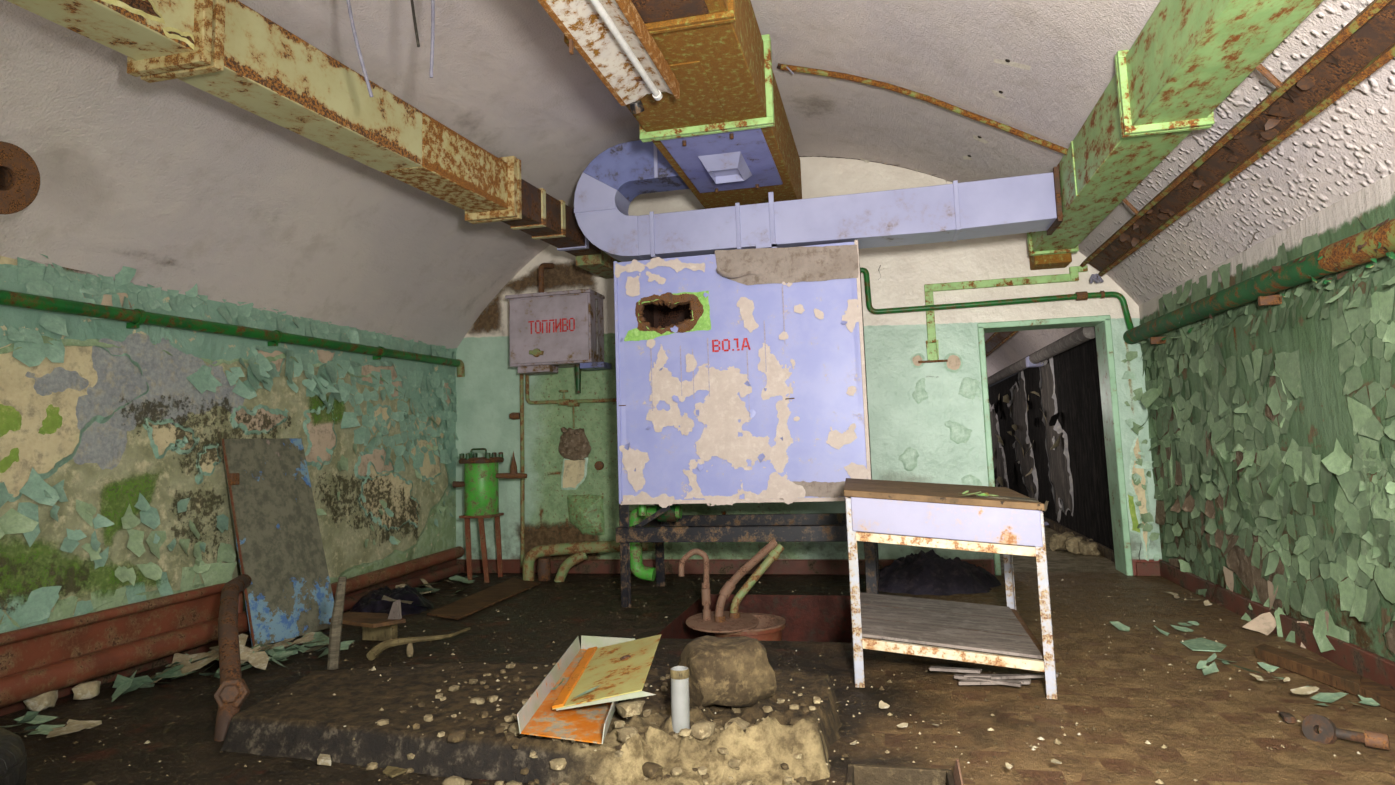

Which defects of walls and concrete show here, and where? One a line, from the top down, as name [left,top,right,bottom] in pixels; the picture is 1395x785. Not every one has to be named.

corrosion [101,0,194,50]
corrosion [1318,218,1395,273]
flaking render [0,254,459,633]
flaking render [989,357,1074,522]
flaking render [1121,217,1395,659]